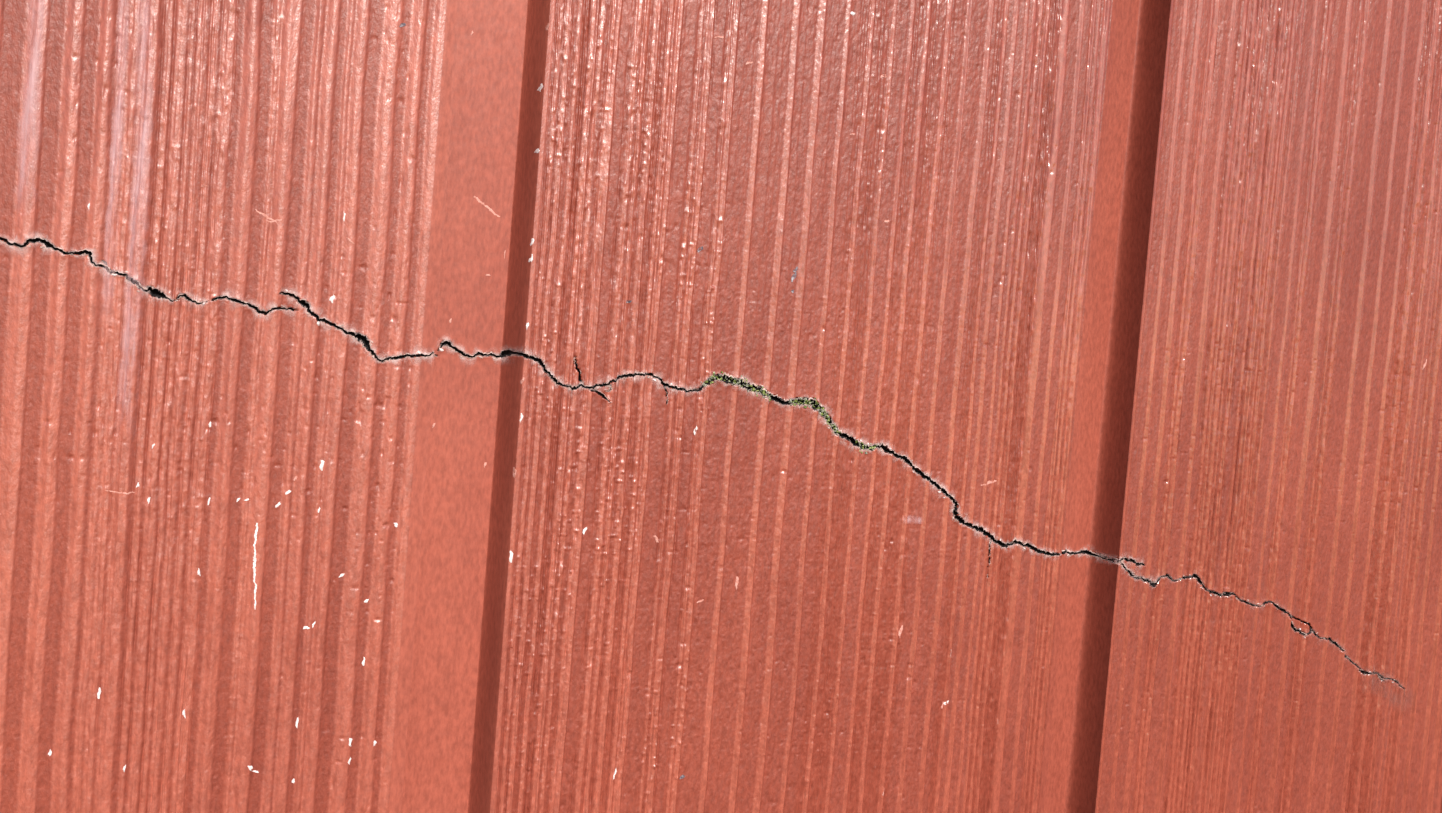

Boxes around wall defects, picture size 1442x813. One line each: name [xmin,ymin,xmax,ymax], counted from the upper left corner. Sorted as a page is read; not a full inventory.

crack [0,236,1403,688]